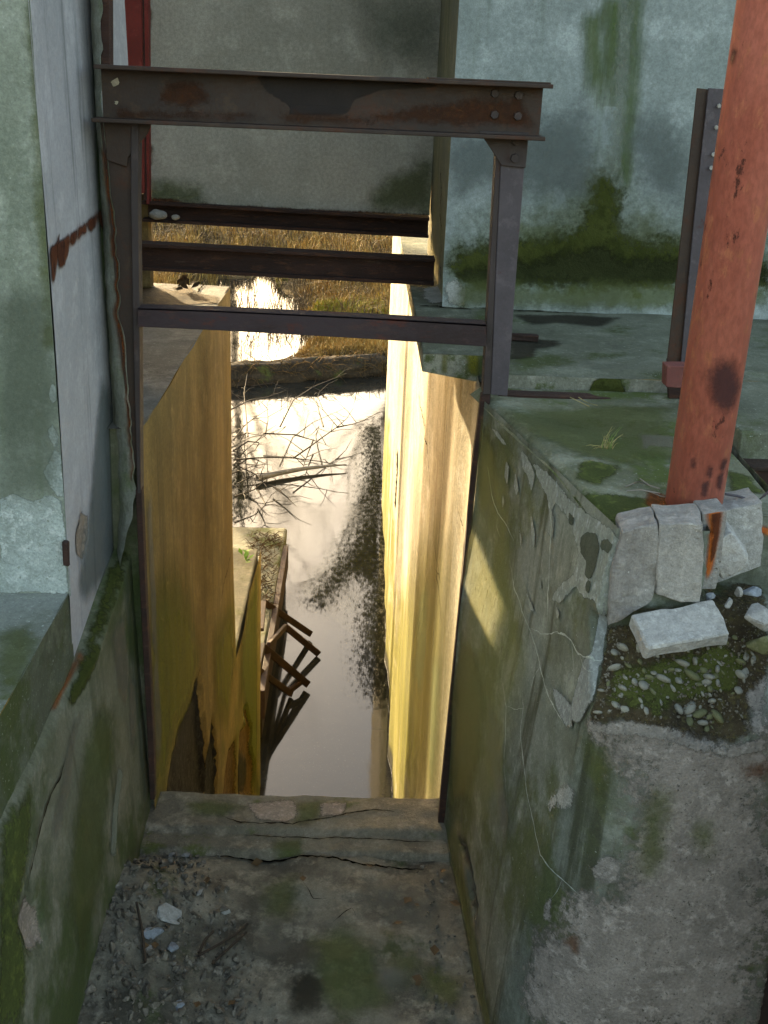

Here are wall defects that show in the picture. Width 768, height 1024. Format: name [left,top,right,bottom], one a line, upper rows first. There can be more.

rust [381,99,529,125]
damp [452,140,494,191]
damp [523,123,585,189]
rust [50,152,125,363]
damp [514,284,675,326]
rust [712,363,739,409]
rust [706,512,721,577]
crack [503,497,601,895]
efflorescence [547,784,574,812]
crack [208,809,430,870]
efflorescence [593,856,620,884]